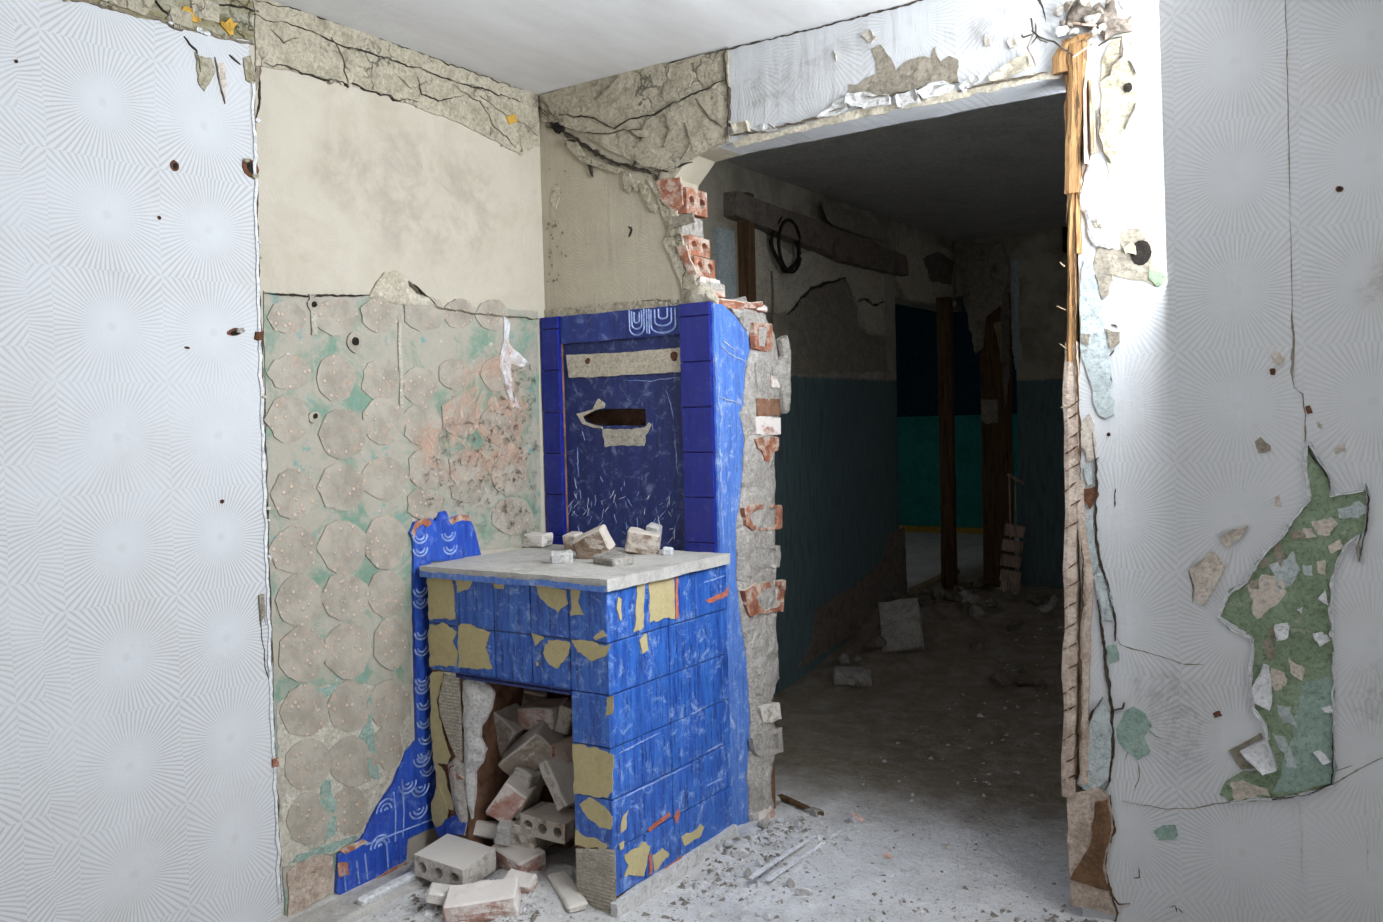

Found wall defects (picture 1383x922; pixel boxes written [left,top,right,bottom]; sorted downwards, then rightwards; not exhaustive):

crack [252,0,923,237]
crack [1031,0,1048,44]
crack [1283,0,1291,192]
peeling [63,0,685,917]
peeling [706,0,1168,792]
crack [1290,227,1306,441]
peeling [1188,405,1371,804]
crack [1332,758,1383,785]